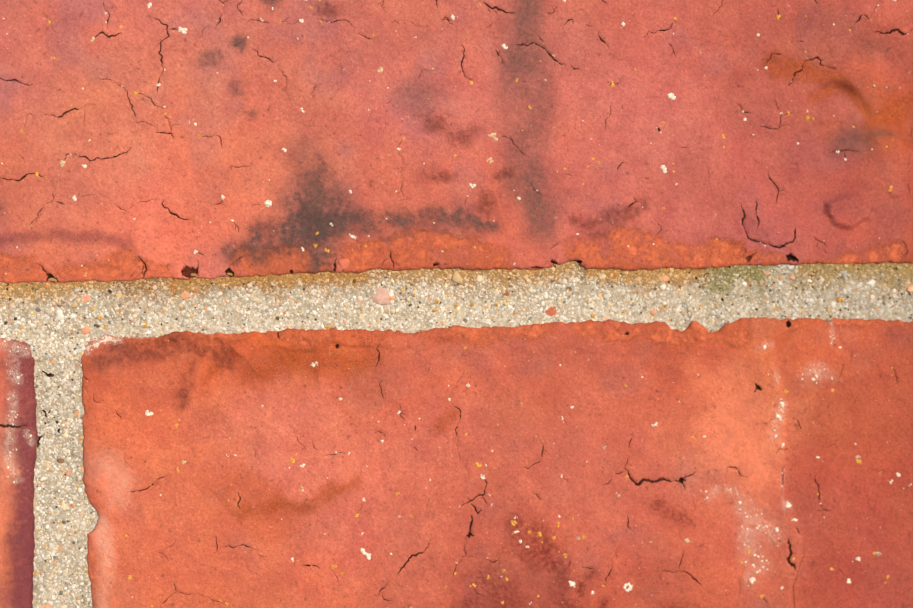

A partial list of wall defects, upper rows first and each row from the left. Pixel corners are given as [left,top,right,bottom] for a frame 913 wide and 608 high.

crack [483,2,515,28]
crack [853,0,913,35]
crack [95,0,178,138]
crack [64,148,131,162]
crack [115,198,190,221]
crack [741,161,826,256]
water stain [224,209,496,273]
crack [0,422,27,430]
crack [451,372,498,579]
crack [603,439,696,505]
crack [371,539,431,601]
crack [780,528,799,573]